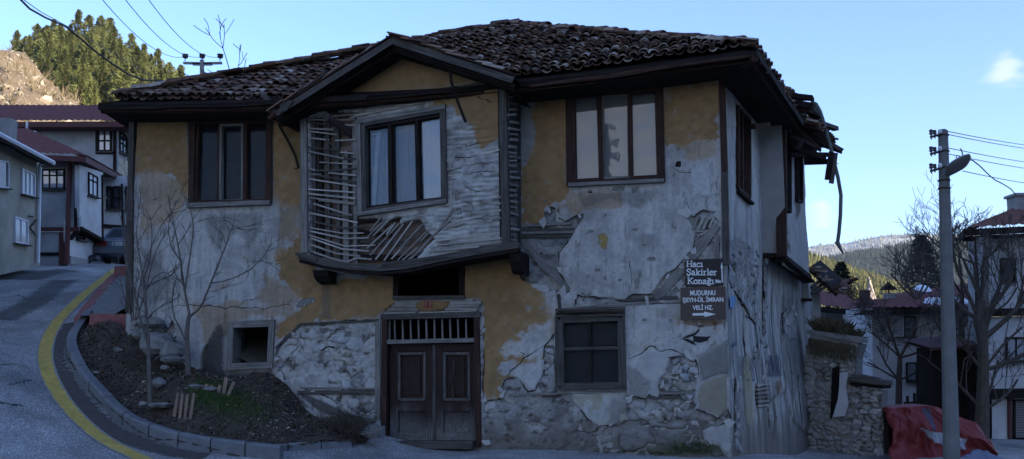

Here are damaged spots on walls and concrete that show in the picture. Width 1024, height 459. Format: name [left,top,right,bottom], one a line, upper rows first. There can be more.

flaking render [274,318,380,422]
flaking render [480,315,742,458]
flaking render [520,198,769,381]
crack [629,345,685,359]